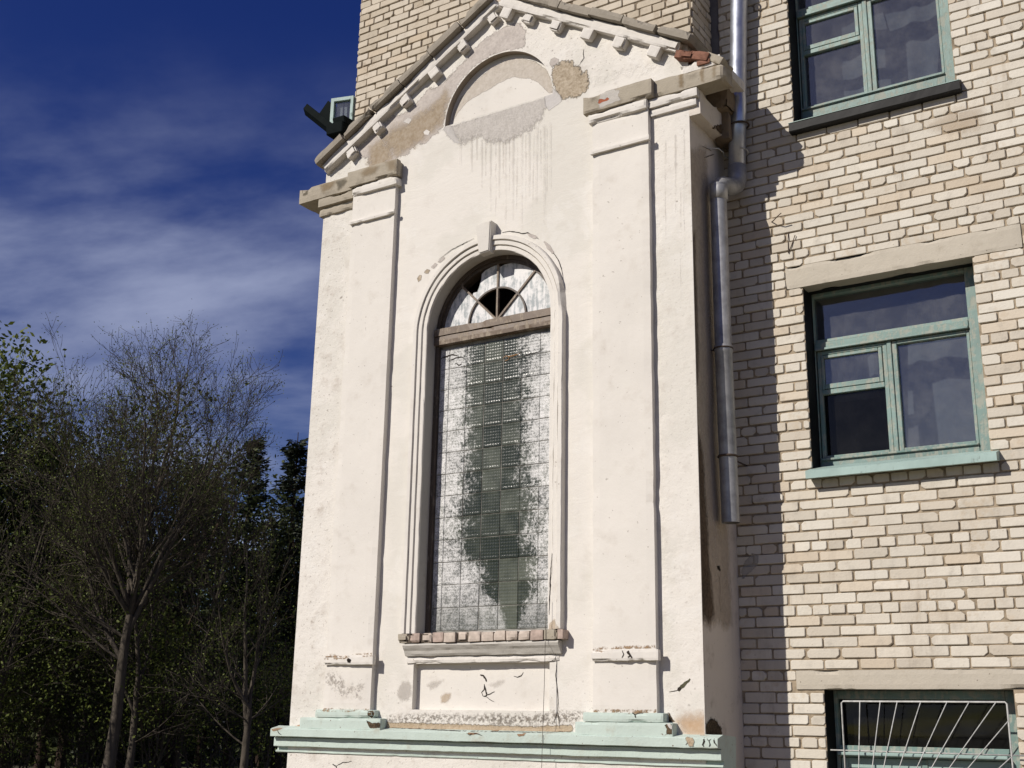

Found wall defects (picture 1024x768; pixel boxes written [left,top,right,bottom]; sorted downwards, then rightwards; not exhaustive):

flaking render [350,23,590,166]
water stain [691,150,730,624]
crack [402,657,560,733]